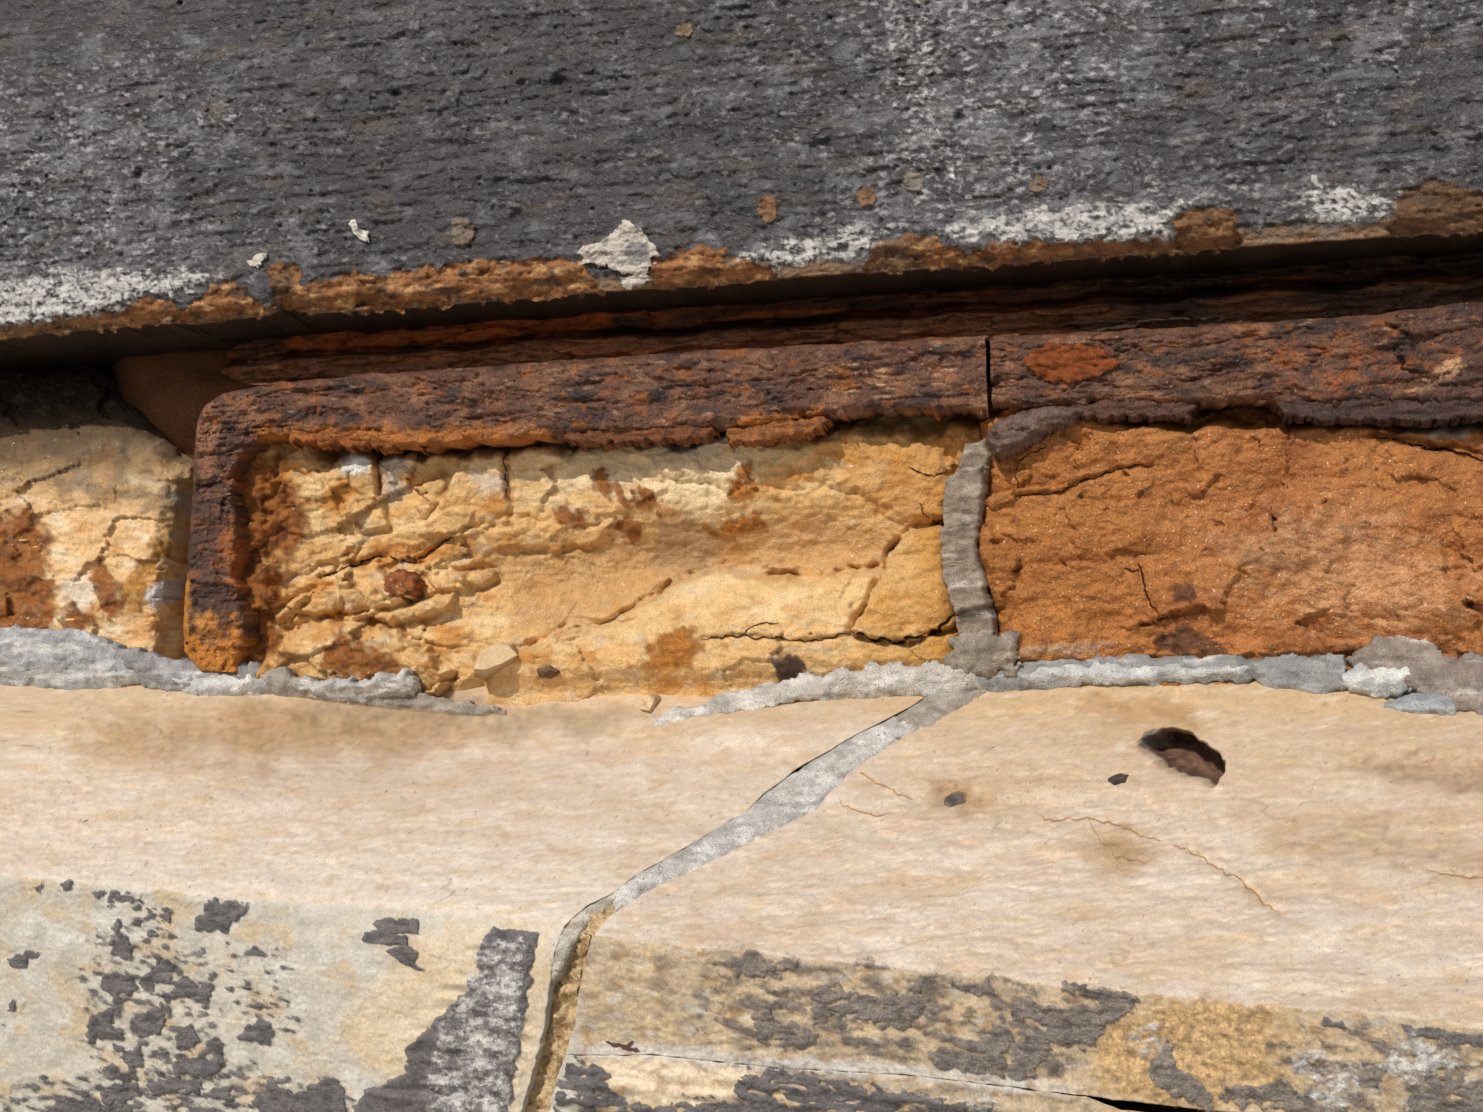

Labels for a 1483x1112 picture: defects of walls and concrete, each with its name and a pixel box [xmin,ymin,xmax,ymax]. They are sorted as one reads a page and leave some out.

water stain [733,223,888,271]
water stain [945,197,1199,244]
water stain [0,266,223,326]
spalling [0,220,776,340]
corrosion [986,399,1199,462]
corrosion [564,416,834,545]
corrosion [0,508,171,630]
crack [839,772,914,816]
peeling [0,890,538,1112]
crack [605,1041,640,1052]
spalling [553,950,1483,1112]
crack [1118,1104,1220,1112]